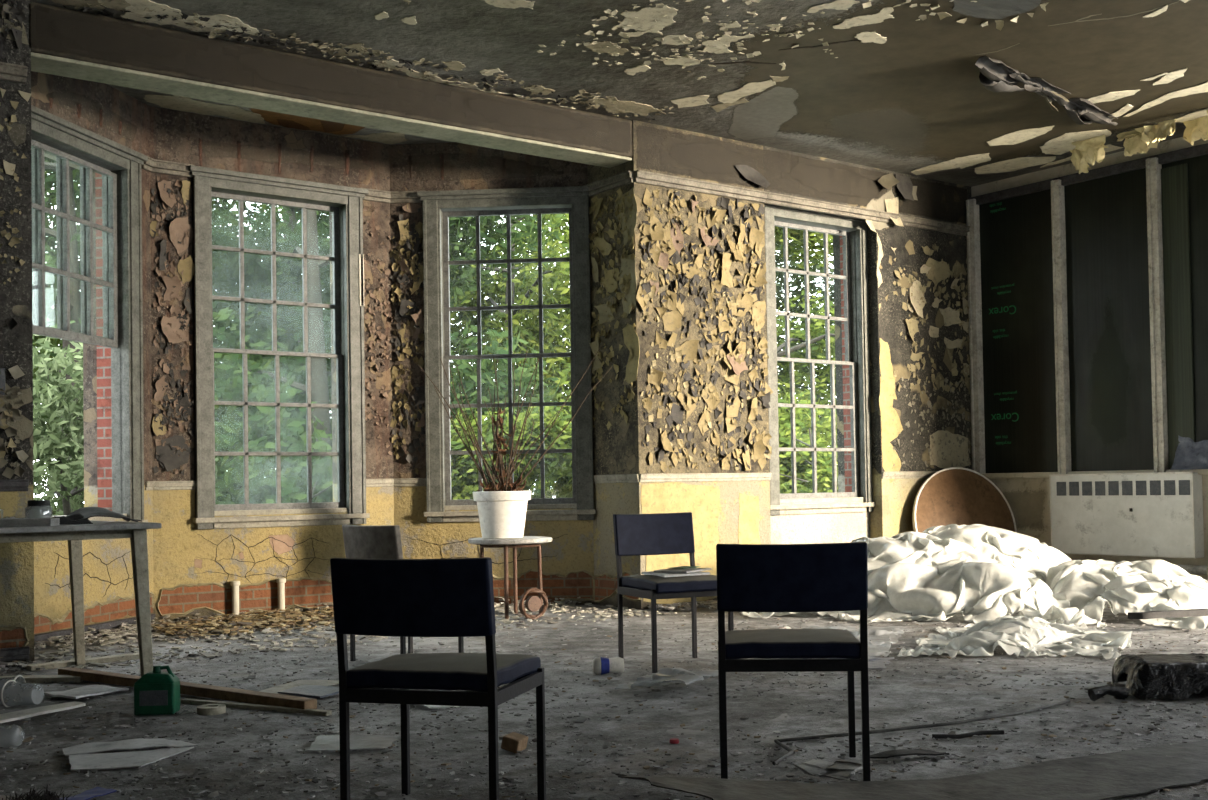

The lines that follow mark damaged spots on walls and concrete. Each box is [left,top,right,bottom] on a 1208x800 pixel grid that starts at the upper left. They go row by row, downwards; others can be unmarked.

peeling [0,149,27,300]
peeling [0,88,31,132]
peeling [52,0,789,124]
peeling [735,165,770,188]
peeling [537,0,1048,80]
peeling [866,56,1208,233]
peeling [1143,0,1189,17]
peeling [0,365,29,479]
peeling [150,176,195,475]
peeling [363,203,426,474]
peeling [588,188,773,472]
peeling [891,244,972,467]